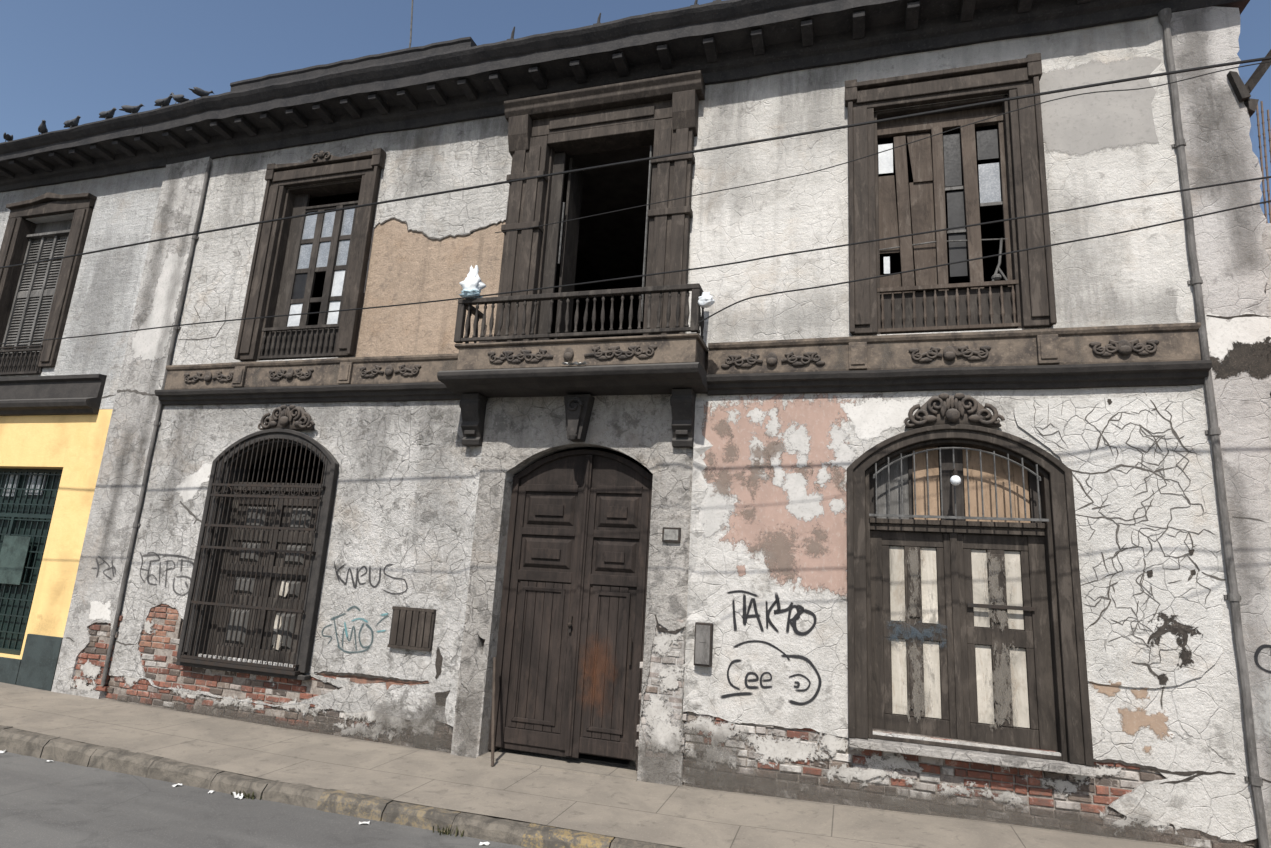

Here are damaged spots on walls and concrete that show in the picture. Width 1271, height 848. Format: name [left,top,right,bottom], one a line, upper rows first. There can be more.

peeling [355,217,506,357]
peeling [1205,312,1271,381]
peeling [691,393,923,599]
crack [1034,400,1267,707]
flaking render [71,599,456,753]
flaking render [636,612,1259,848]